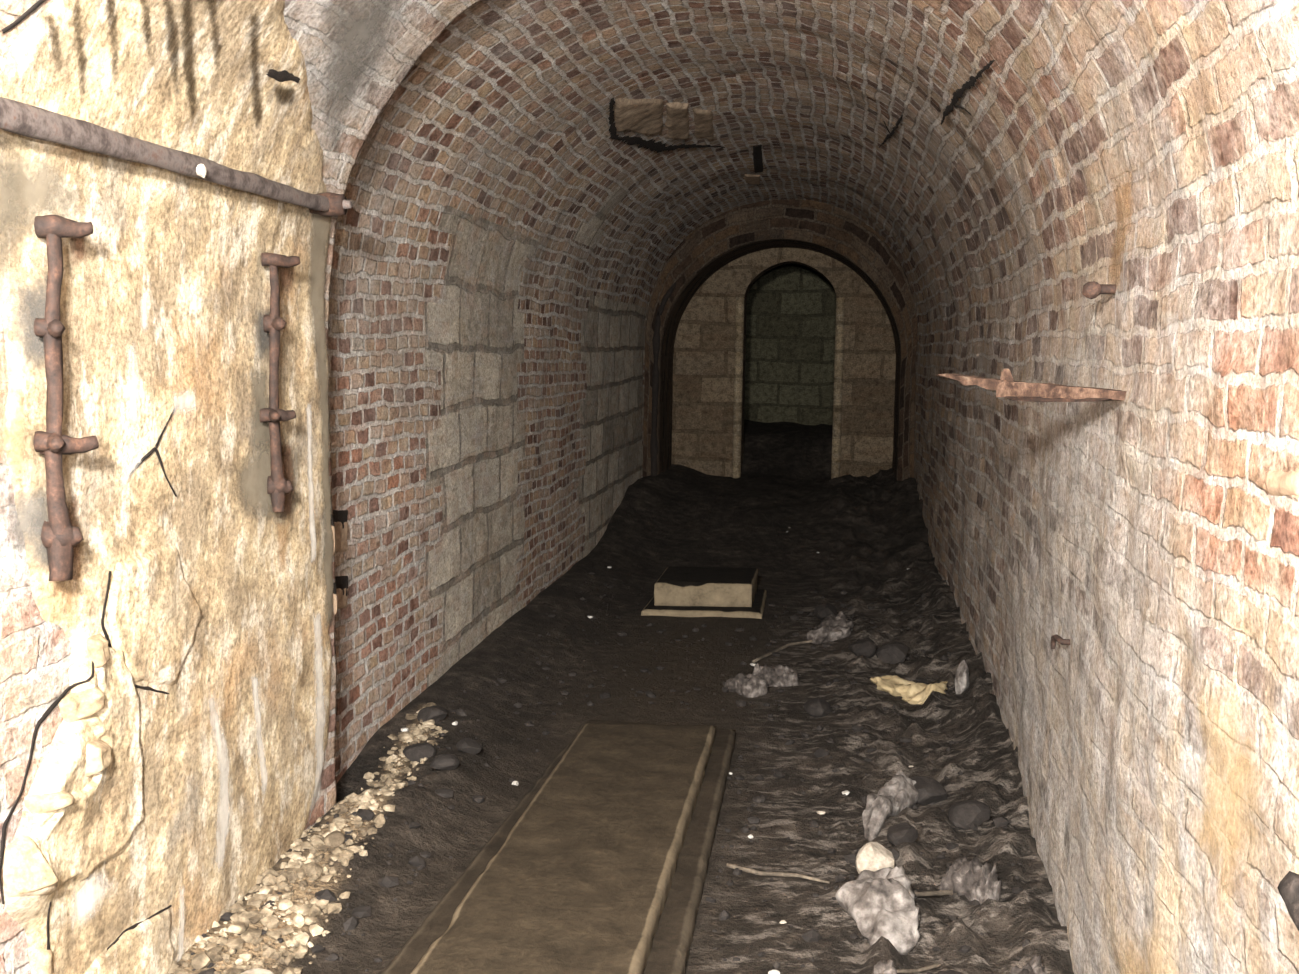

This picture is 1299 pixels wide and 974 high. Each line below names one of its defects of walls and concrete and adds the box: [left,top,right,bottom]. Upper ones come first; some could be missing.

crack [2,0,46,34]
damp [74,5,86,90]
damp [107,0,117,74]
damp [164,0,221,115]
damp [250,14,262,124]
rust [71,237,84,260]
rust [937,369,1126,402]
rust [68,499,78,527]
crack [128,403,178,497]
rust [281,446,293,513]
peeling [0,633,144,904]
crack [36,902,53,974]